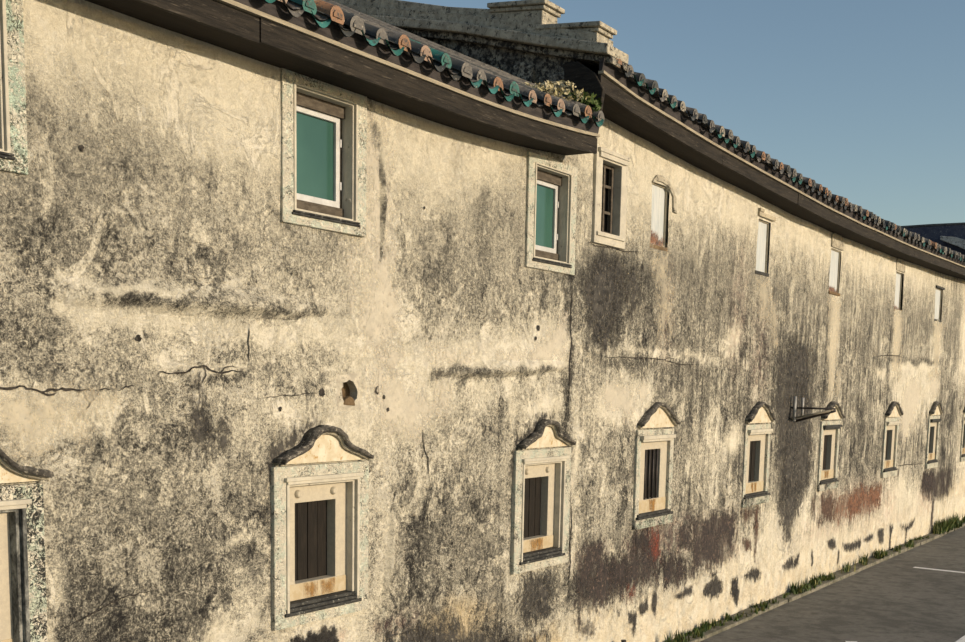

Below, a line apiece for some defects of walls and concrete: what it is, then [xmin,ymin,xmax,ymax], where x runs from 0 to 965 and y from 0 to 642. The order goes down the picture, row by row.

crack [160,324,251,383]
crack [0,385,134,409]
damp [772,336,818,549]
corrosion [832,482,882,526]
damp [375,566,560,642]
mould [571,504,739,640]